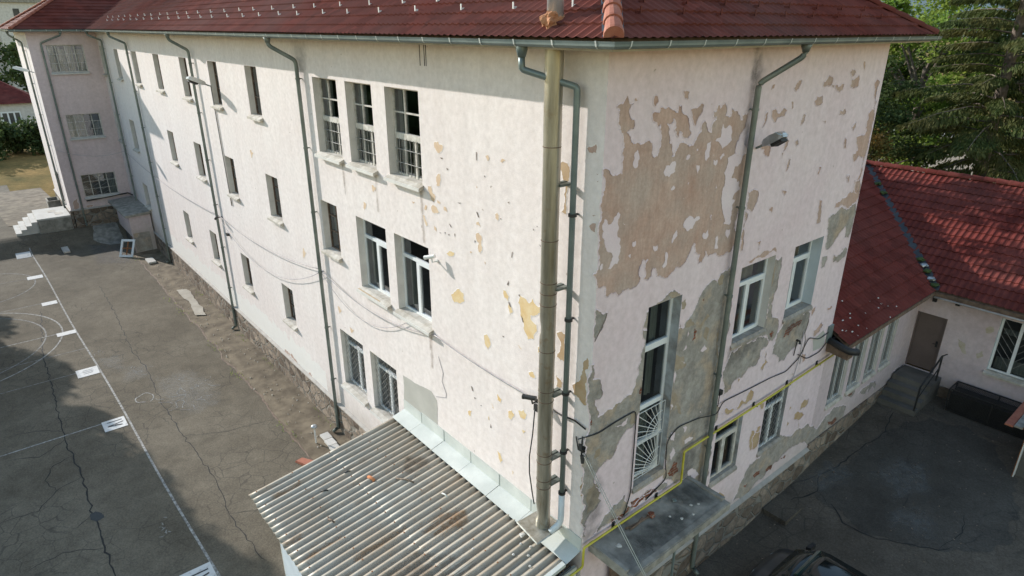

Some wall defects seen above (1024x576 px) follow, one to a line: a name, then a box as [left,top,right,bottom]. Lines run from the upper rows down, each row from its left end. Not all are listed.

peeling [762,61,866,127]
peeling [412,141,455,236]
spalling [815,79,880,269]
peeling [470,212,486,264]
peeling [451,288,465,304]
peeling [503,281,540,354]
peeling [555,90,843,538]
peeling [468,386,527,433]